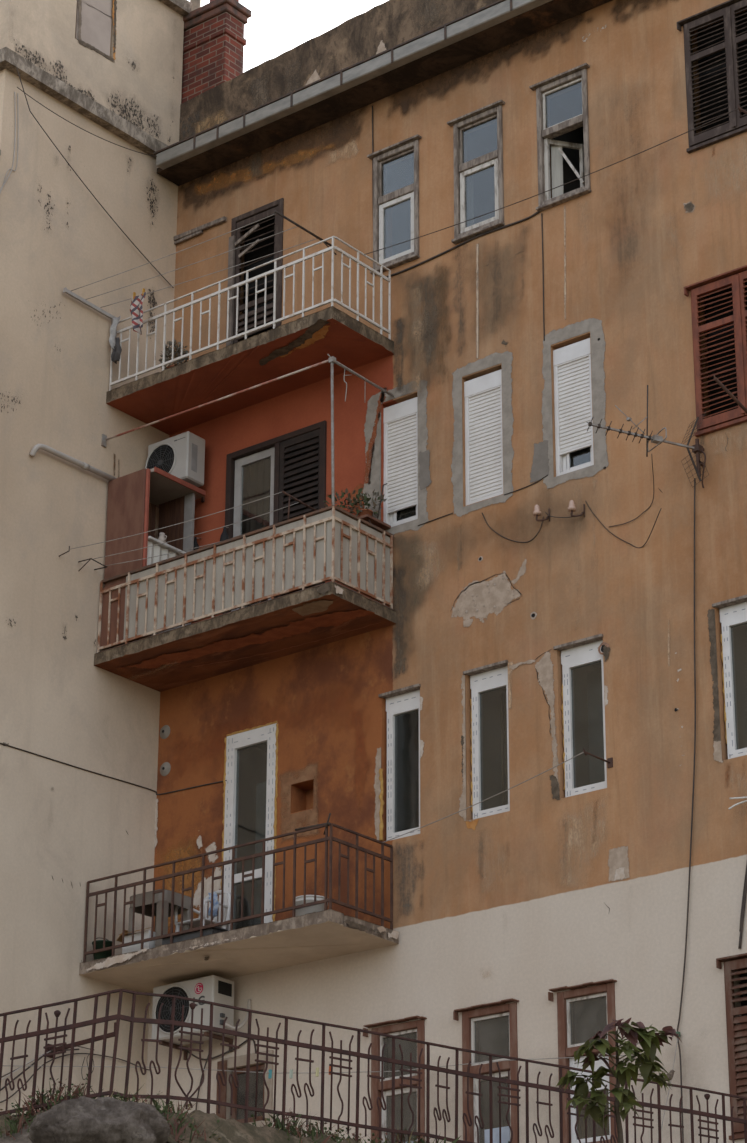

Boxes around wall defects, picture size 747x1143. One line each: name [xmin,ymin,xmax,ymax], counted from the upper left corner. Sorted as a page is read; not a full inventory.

leakage [14,39,94,101]
leakage [391,0,667,115]
leakage [108,94,225,142]
spalling [451,559,527,627]
spalling [459,675,482,830]
spalling [508,650,560,800]
peeling [86,948,147,971]
spalling [345,920,400,939]